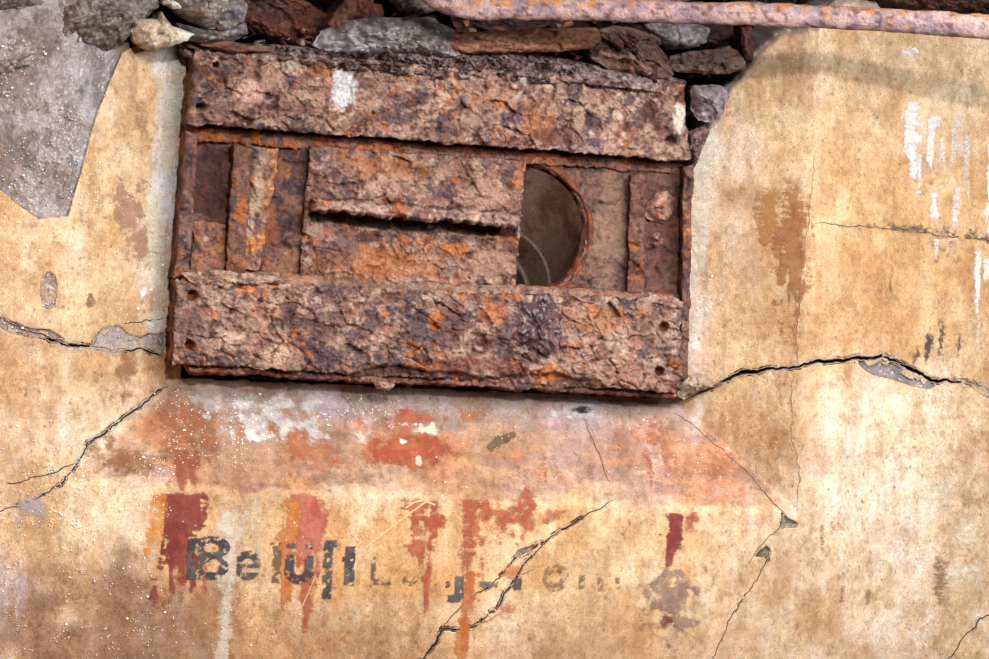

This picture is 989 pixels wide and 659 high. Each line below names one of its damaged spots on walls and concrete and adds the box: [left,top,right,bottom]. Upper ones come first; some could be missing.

spalling [0,0,135,219]
crack [0,314,166,360]
peeling [111,180,148,266]
corrosion [88,399,217,605]
corrosion [180,270,285,285]
corrosion [280,409,459,483]
crack [421,417,614,659]
water stain [753,186,815,339]
crack [672,147,989,659]
spalling [859,359,935,389]
water stain [892,102,989,255]
water stain [973,252,989,313]